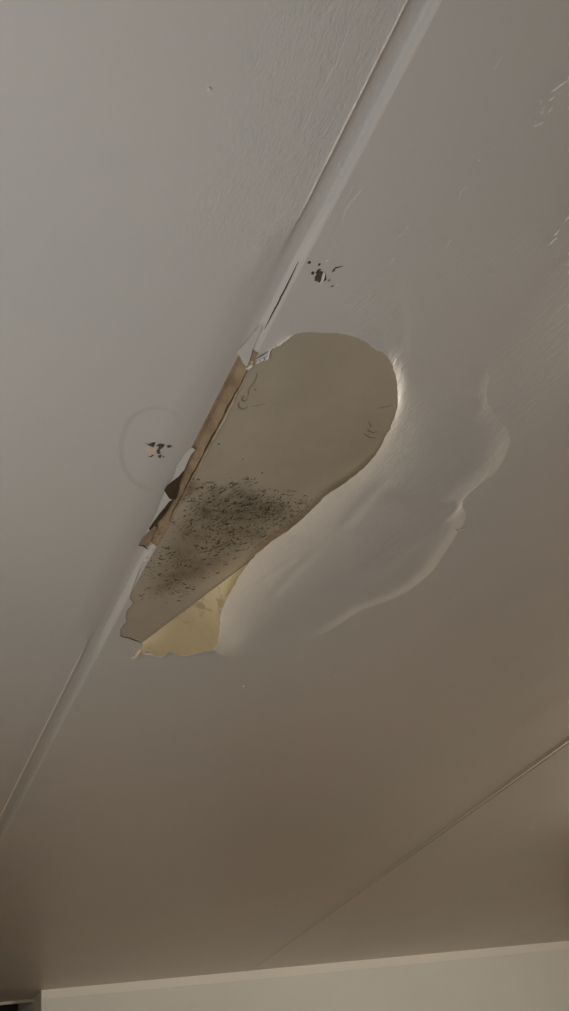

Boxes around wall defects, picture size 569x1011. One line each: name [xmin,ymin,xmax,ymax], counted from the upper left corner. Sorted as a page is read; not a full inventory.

water stain [139,476,312,603]
peeling [120,269,510,659]